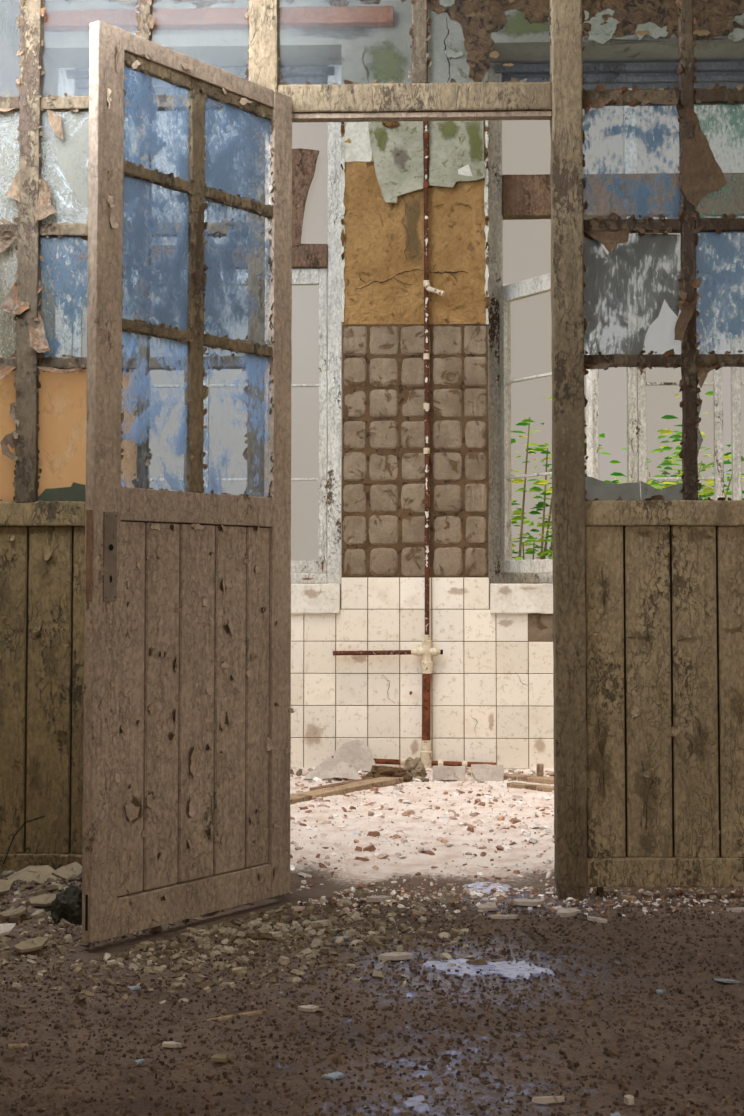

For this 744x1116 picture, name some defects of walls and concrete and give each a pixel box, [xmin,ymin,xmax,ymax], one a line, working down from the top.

damp [368,42,405,82]
spalling [428,0,550,81]
spalling [582,0,679,44]
spalling [693,0,744,42]
peeling [649,98,727,206]
crack [356,197,469,290]
peeling [340,120,490,577]